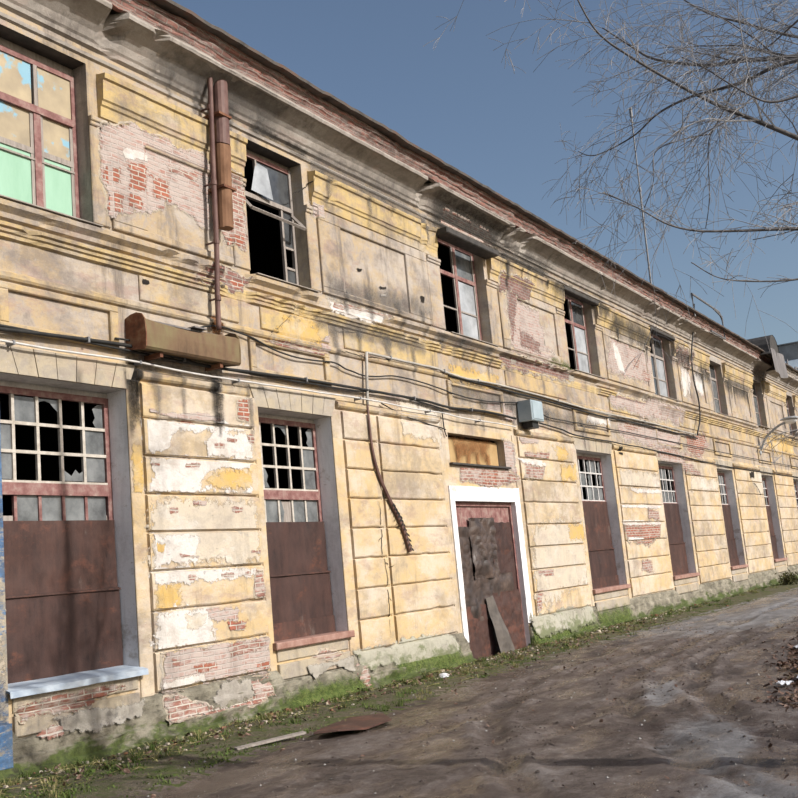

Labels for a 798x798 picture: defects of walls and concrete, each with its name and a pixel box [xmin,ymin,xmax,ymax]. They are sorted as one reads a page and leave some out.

flaking render [96,120,248,253]
flaking render [497,269,574,385]
flaking render [606,335,652,384]
peeling [140,397,266,600]
flaking render [458,436,550,489]
flaking render [618,466,661,548]
flaking render [587,345,719,494]
corrosion [3,520,123,684]
flaking render [642,558,653,573]
flaking render [0,682,127,740]
flaking render [149,602,277,725]